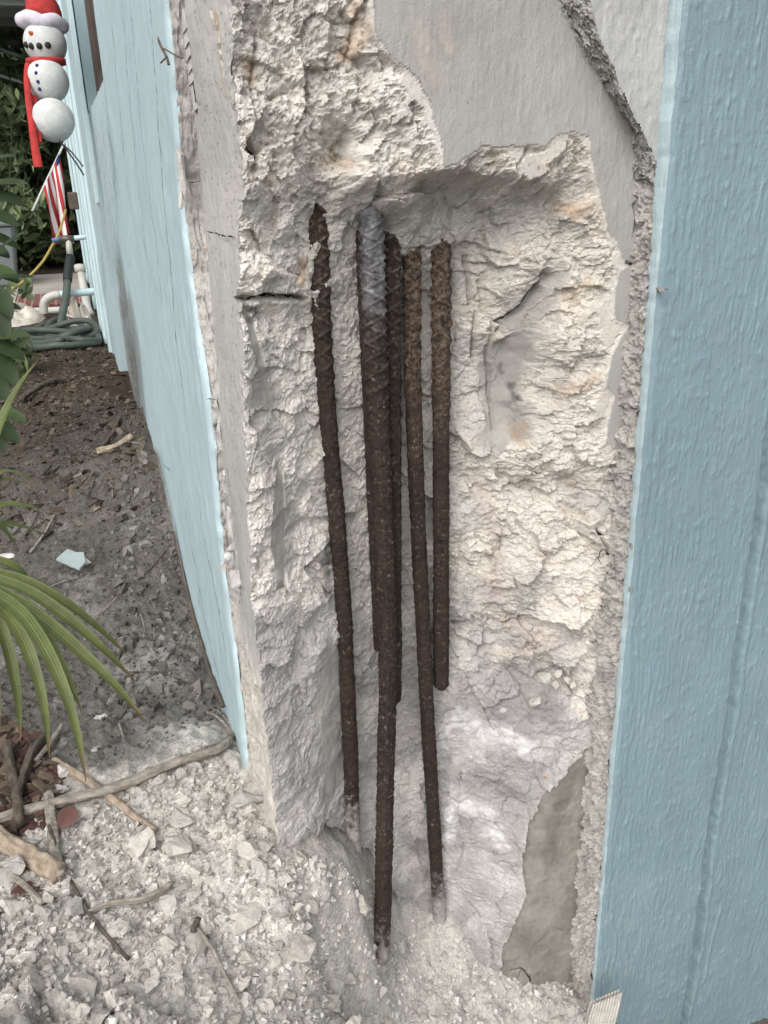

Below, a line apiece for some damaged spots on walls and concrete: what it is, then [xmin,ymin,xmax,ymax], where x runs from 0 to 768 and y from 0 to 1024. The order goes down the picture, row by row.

crack [238,293,296,306]
spalling [169,0,669,1007]